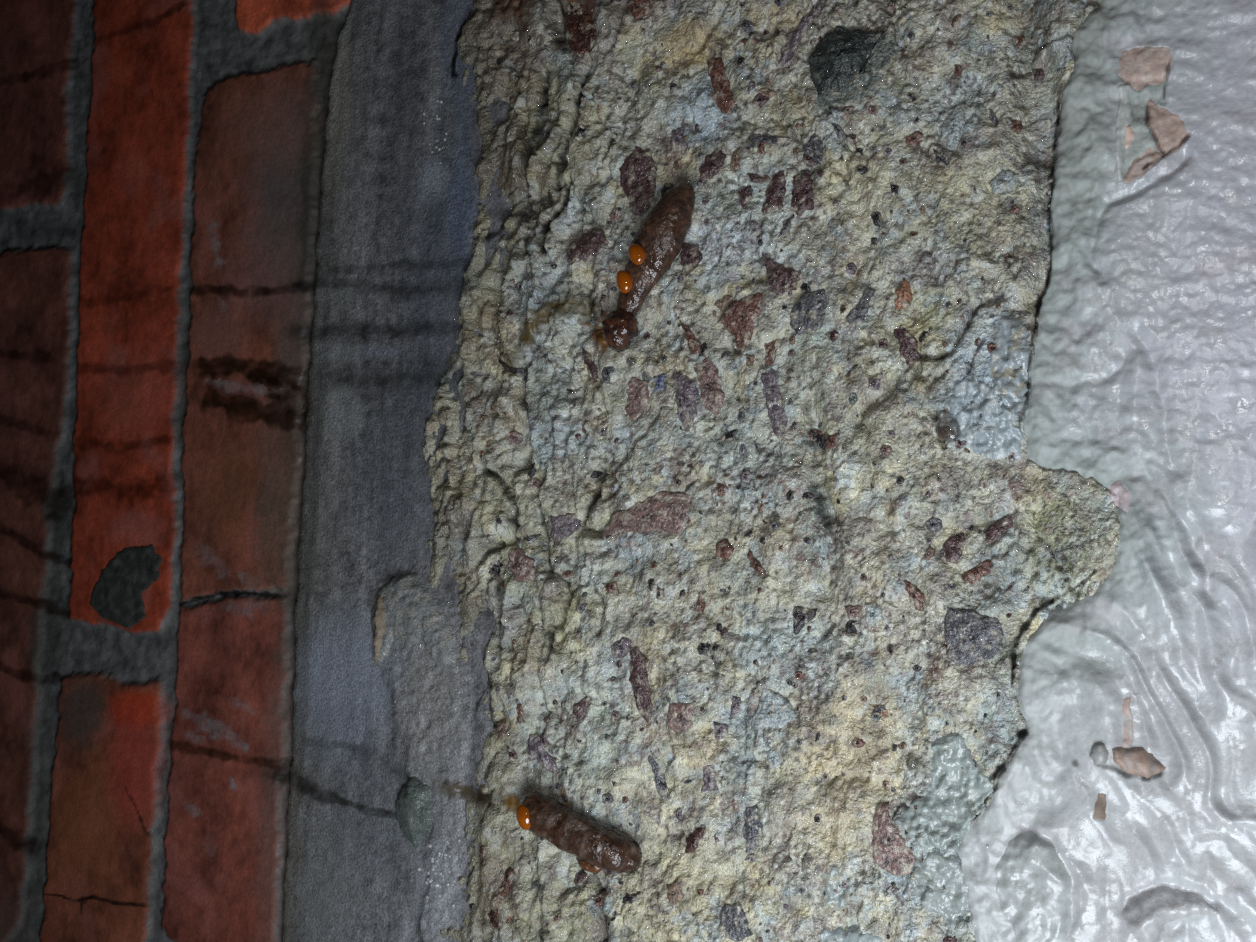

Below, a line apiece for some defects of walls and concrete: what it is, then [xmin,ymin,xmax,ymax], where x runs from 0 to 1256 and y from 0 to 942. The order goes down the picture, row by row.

spalling [421,0,1130,942]
crack [180,591,277,606]
crack [1010,571,1095,682]